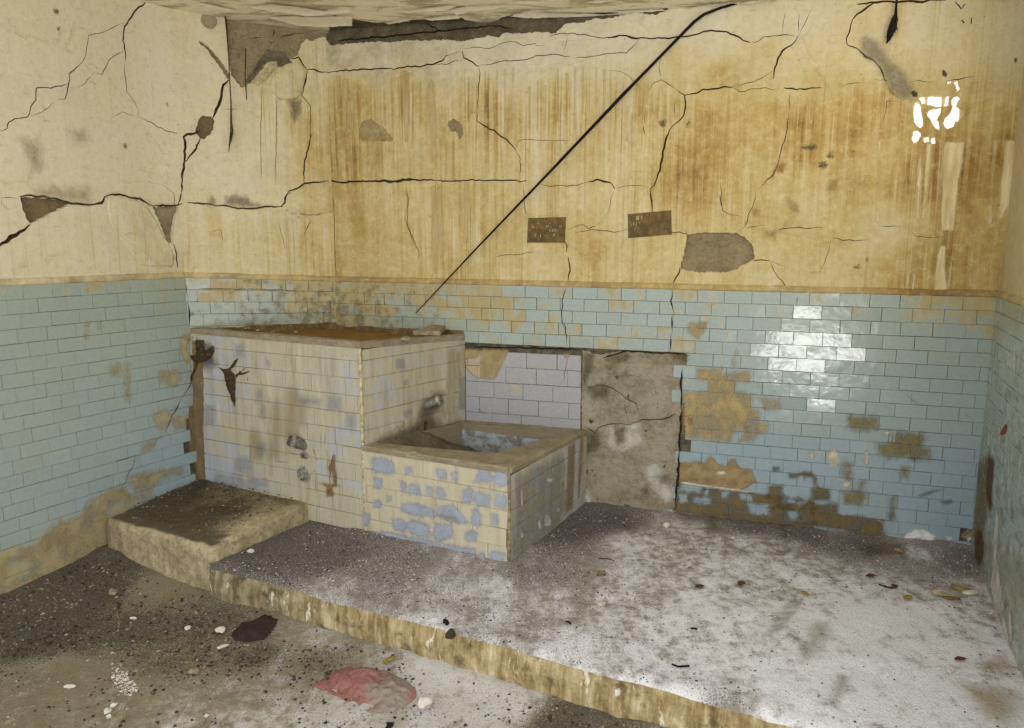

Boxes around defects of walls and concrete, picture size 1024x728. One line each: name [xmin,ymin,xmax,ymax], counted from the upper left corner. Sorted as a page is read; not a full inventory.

spalling [197,0,759,88]
crack [846,0,1013,123]
spalling [359,119,393,142]
damp [916,142,964,231]
damp [988,140,1015,241]
crack [0,2,891,503]
spalling [681,232,755,273]
damp [934,245,947,290]
rust [325,457,336,496]
peeling [363,457,507,561]
flaking render [581,350,688,511]
rust [974,456,993,567]